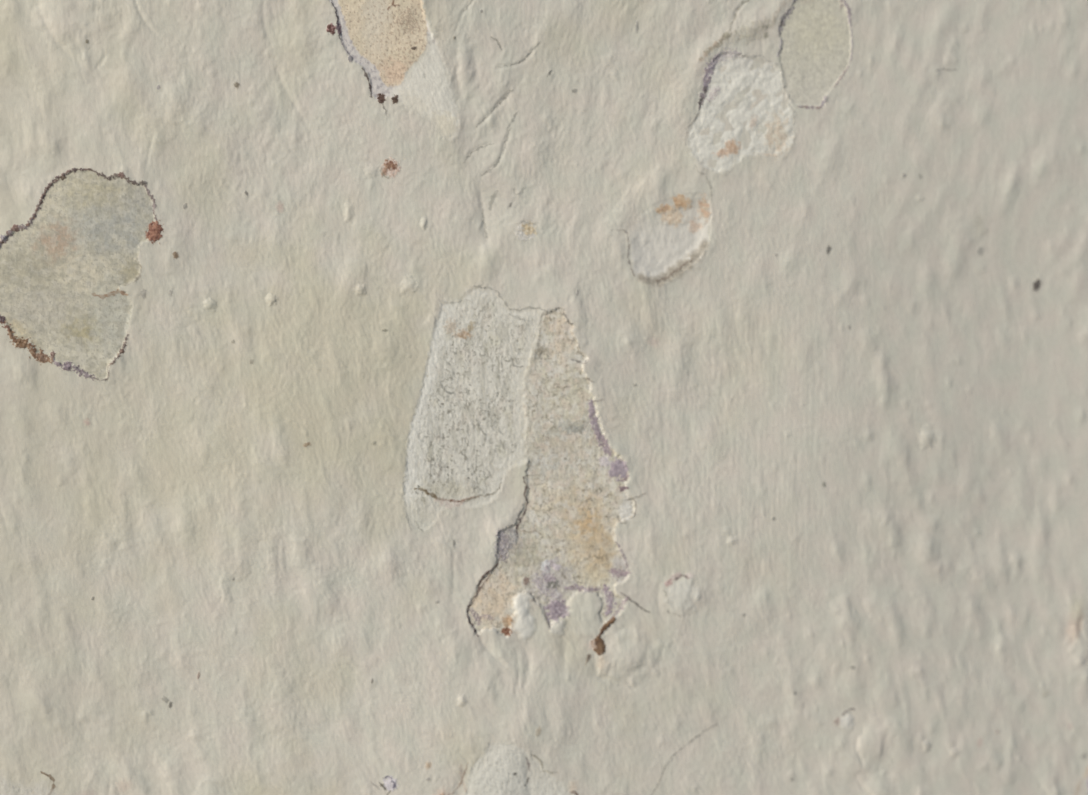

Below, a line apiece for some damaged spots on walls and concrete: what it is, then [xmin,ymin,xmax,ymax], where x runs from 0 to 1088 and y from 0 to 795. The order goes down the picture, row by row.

peeling [328,0,464,144]
peeling [0,167,165,382]
peeling [401,279,646,646]
peeling [458,741,581,795]